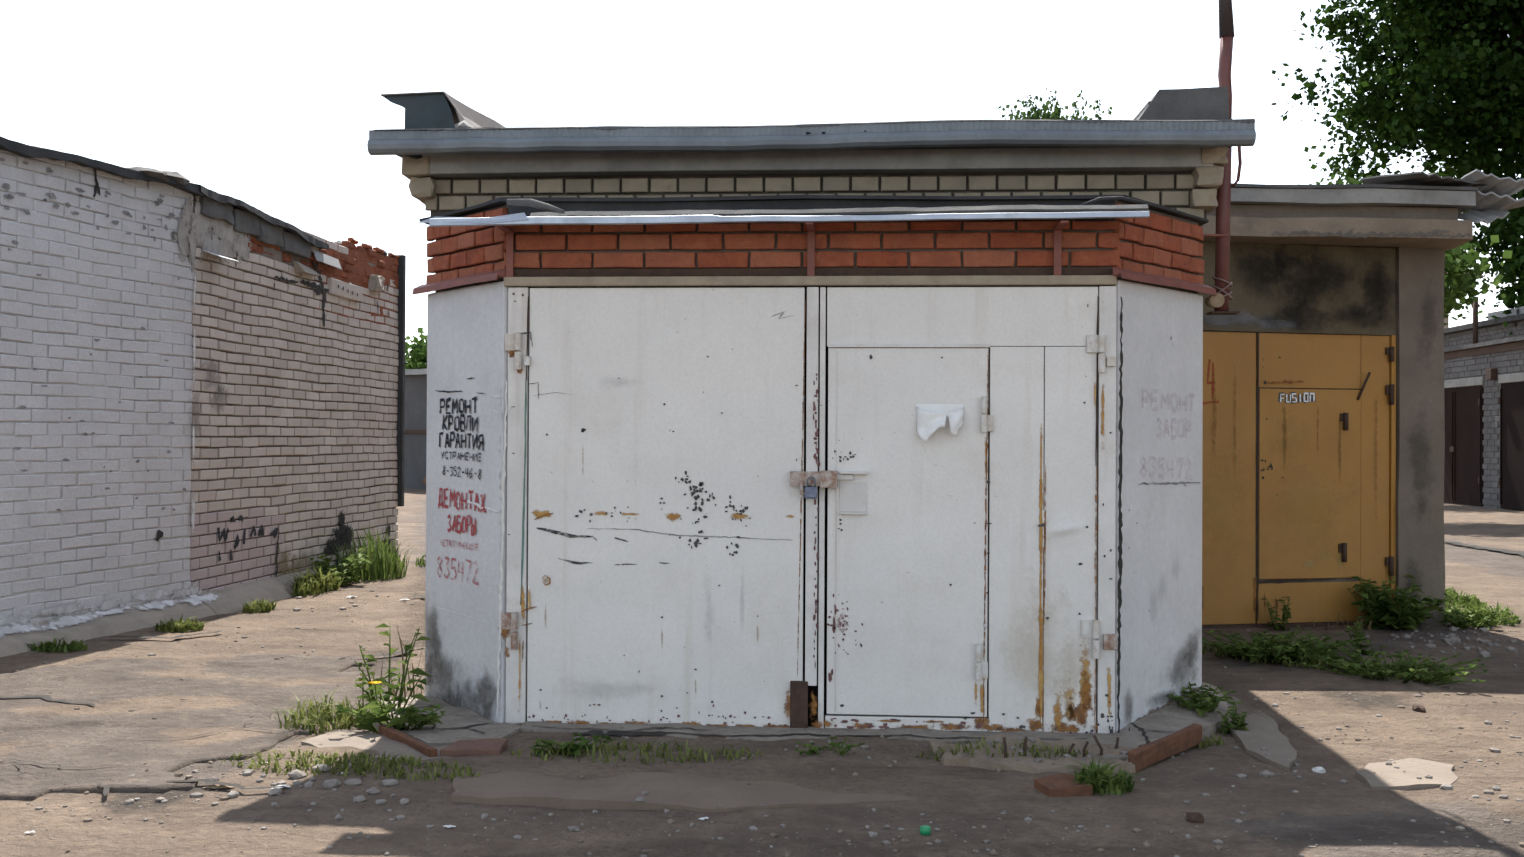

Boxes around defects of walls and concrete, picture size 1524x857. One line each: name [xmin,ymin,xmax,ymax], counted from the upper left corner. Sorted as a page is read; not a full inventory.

spalling [245,234,400,329]
damp [1205,256,1347,328]
rust [532,510,554,520]
peeling [669,471,751,556]
rust [853,354,1111,733]
rust [501,575,551,698]
rust [546,498,802,728]
rust [810,693,832,728]